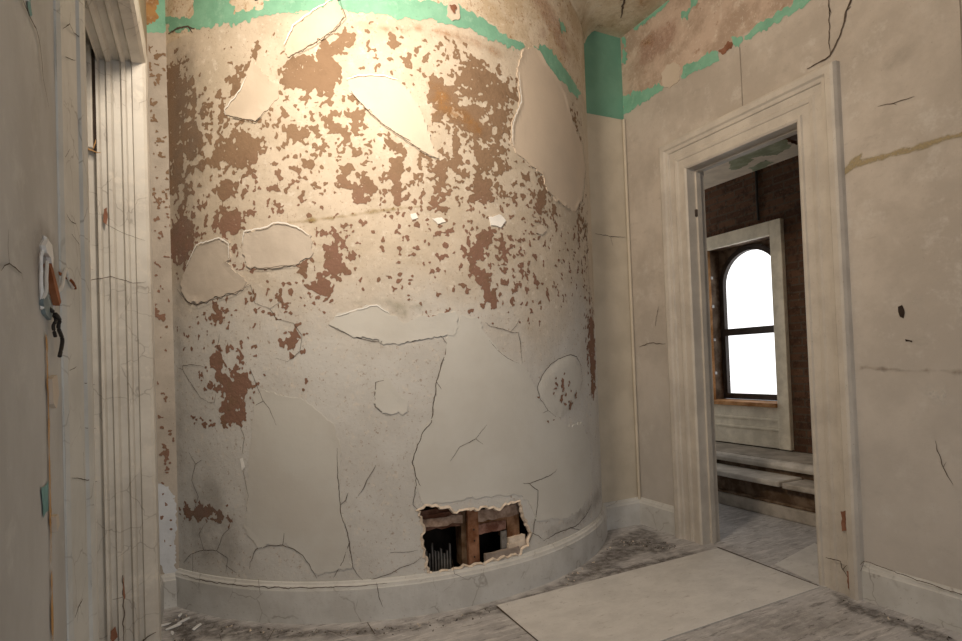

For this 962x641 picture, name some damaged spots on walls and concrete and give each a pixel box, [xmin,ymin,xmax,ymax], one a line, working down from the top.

peeling [621,0,810,114]
crack [807,0,852,69]
peeling [146,0,596,575]
crack [407,336,447,509]
crack [537,329,597,417]
crack [181,453,418,641]
crack [524,473,591,541]